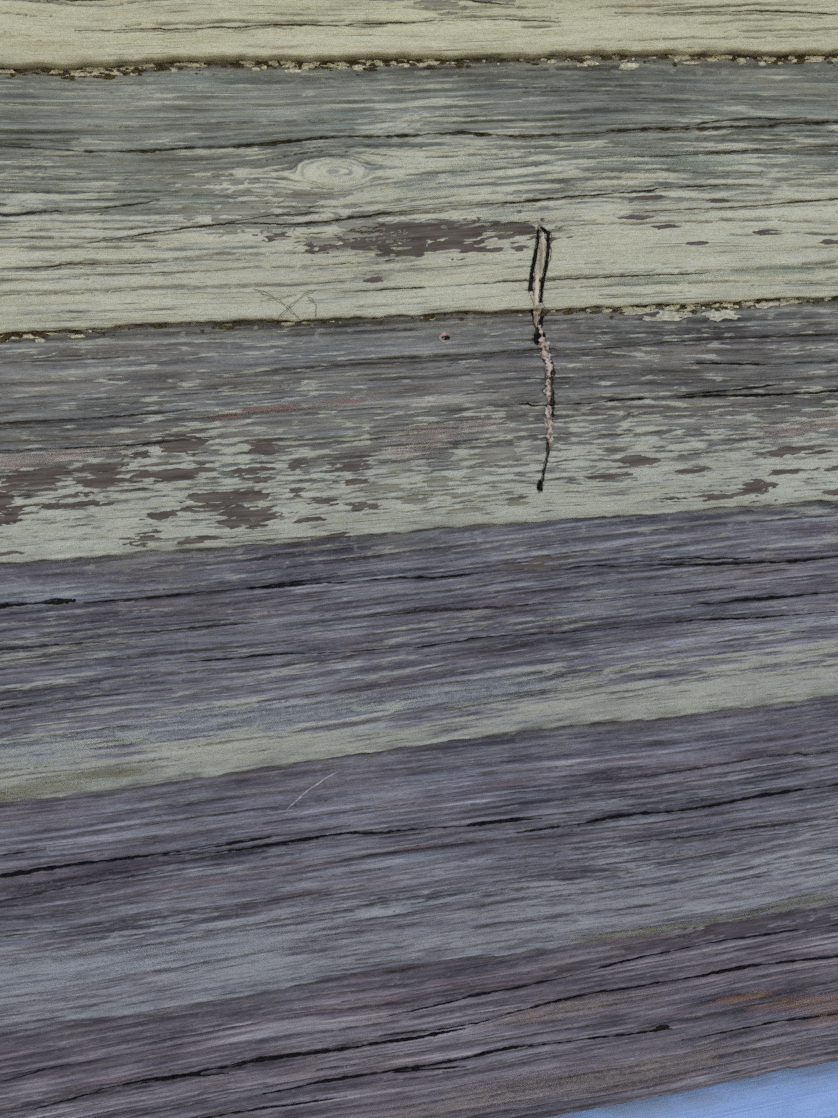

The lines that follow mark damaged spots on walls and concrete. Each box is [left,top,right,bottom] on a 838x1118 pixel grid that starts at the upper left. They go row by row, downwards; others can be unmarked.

crack [2,117,838,159]
peeling [129,169,573,265]
crack [0,184,838,492]
peeling [0,434,518,547]
peeling [584,455,661,479]
peeling [656,446,838,503]
crack [0,556,838,667]
crack [0,694,119,710]
crack [647,749,836,777]
crack [0,784,838,902]
crack [35,924,838,1118]
crack [0,1064,68,1082]